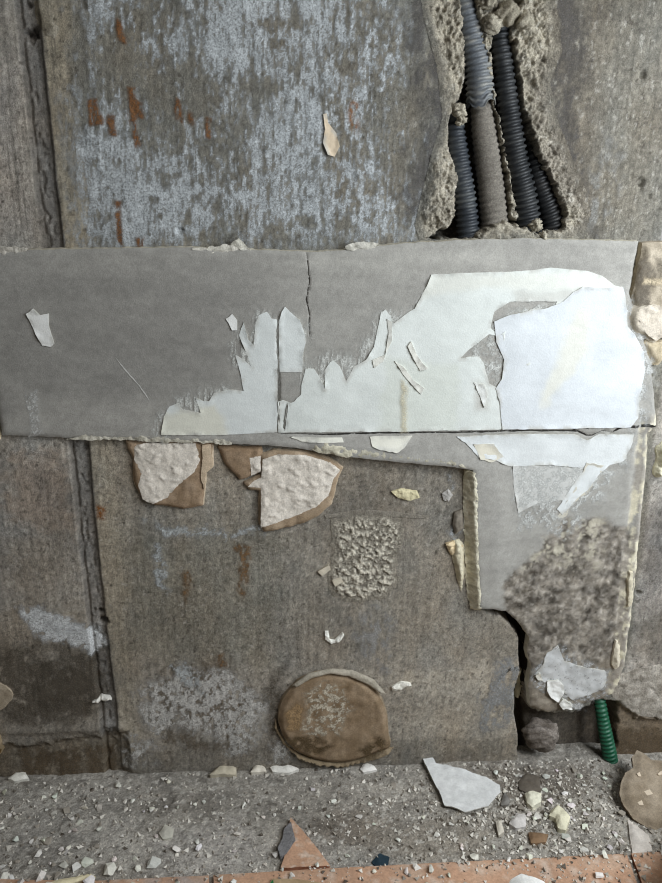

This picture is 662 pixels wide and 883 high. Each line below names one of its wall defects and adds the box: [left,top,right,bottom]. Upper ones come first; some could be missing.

corrosion [88,99,117,136]
corrosion [127,87,144,147]
leakage [65,0,442,248]
spalling [415,0,595,241]
crack [304,258,312,336]
peeling [67,268,653,610]
leakage [0,607,108,725]
crack [500,611,528,707]